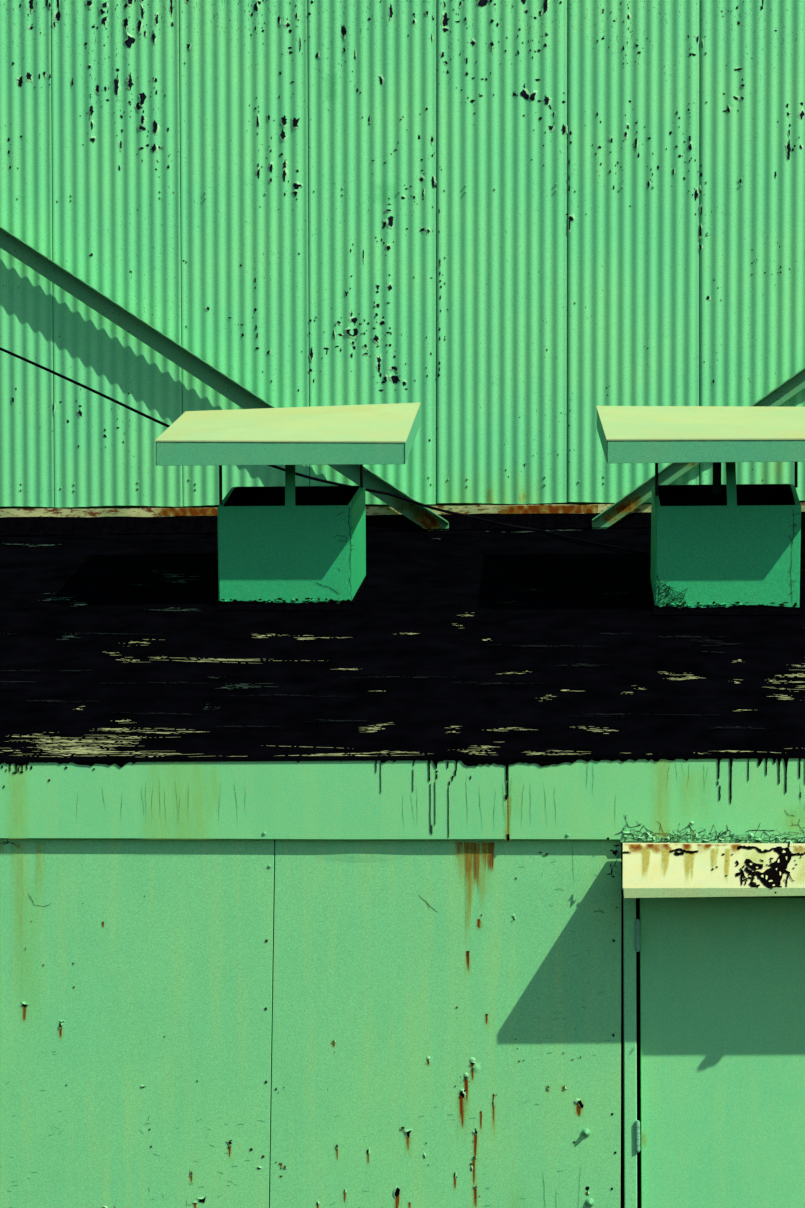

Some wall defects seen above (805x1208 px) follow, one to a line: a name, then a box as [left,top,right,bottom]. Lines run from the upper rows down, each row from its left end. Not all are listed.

peeling [84,0,189,48]
peeling [80,44,179,170]
peeling [247,97,303,211]
peeling [301,274,441,391]
corrosion [161,508,217,516]
corrosion [502,494,641,520]
leakage [767,663,805,700]
leakage [280,746,556,837]
leakage [526,750,594,787]
leakage [704,748,801,803]
corrosion [457,830,508,918]
peeling [607,821,805,894]